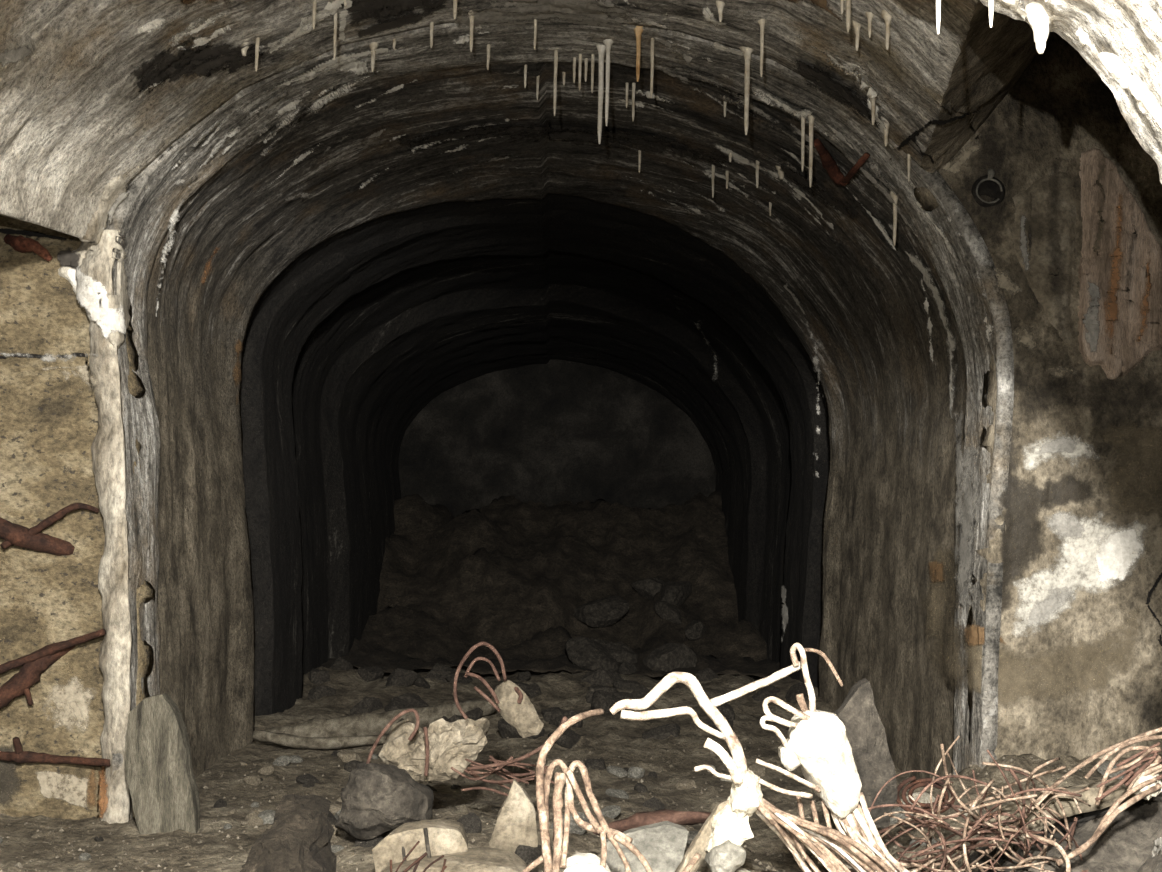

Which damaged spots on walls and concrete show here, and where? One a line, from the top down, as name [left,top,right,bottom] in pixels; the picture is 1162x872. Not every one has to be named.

leakage [1002,0,1028,19]
spalling [943,144,980,174]
spalling [57,174,131,349]
peeling [996,147,1162,380]
leakage [130,0,979,604]
crack [0,353,95,362]
peeling [1024,436,1098,470]
leakage [1000,430,1093,610]
rust [87,769,108,818]